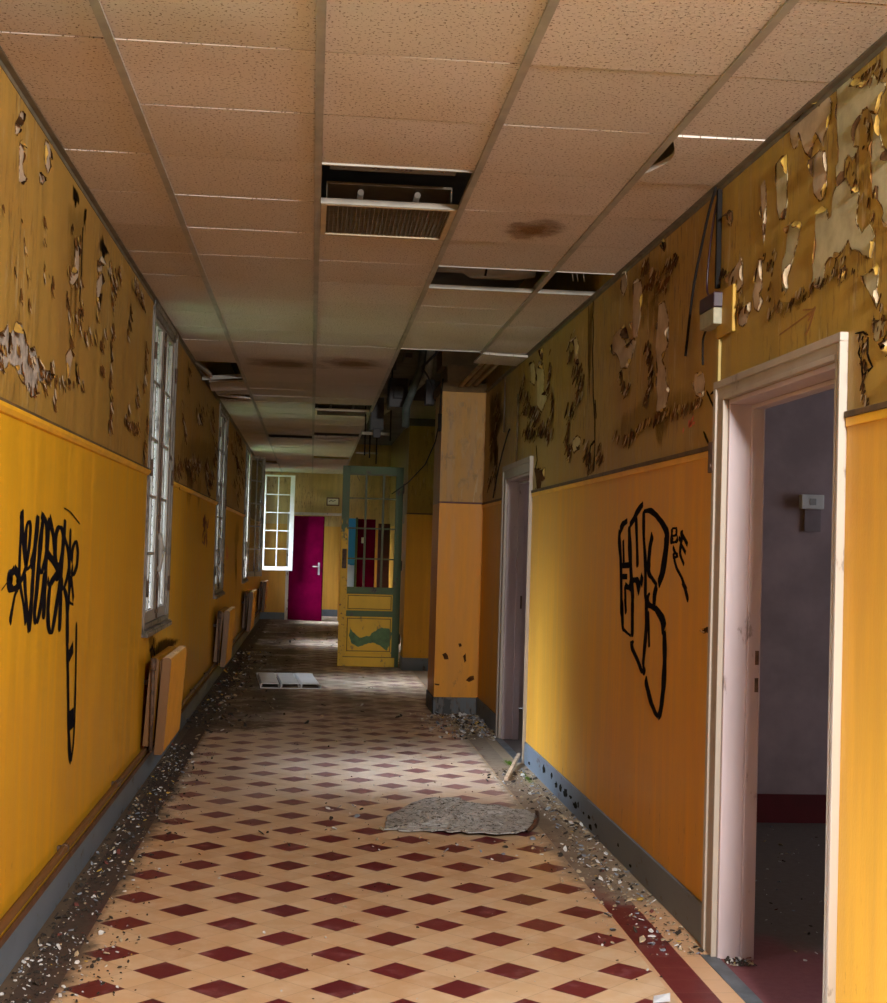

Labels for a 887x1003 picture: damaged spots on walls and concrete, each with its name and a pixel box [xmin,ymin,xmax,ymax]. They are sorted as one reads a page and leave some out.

peeling [15,111,53,185]
leakage [510,221,560,238]
peeling [719,60,887,406]
peeling [0,224,150,468]
peeling [171,362,218,497]
spalling [534,467,545,489]
peeling [518,329,605,476]
peeling [610,238,705,449]
peeling [349,627,392,651]